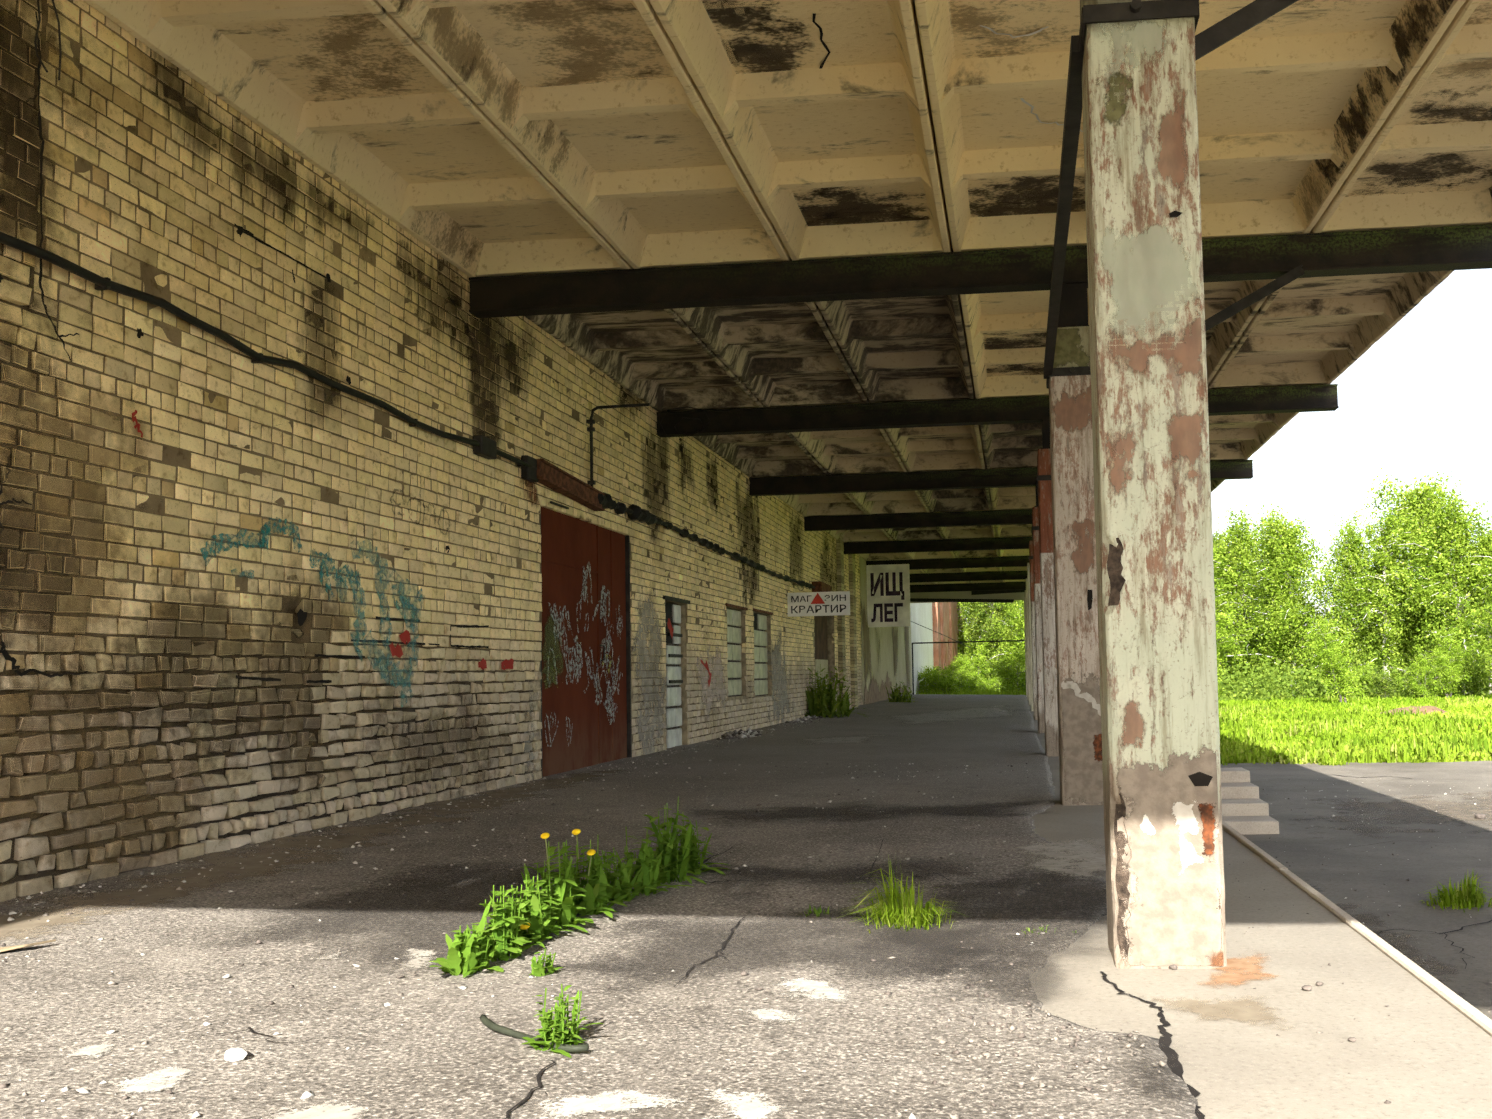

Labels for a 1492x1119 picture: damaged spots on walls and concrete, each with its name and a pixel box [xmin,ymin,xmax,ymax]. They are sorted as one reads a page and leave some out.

leakage [702,0,811,74]
crack [812,13,830,69]
leakage [153,52,369,228]
peeling [1151,89,1188,190]
leakage [794,187,929,226]
leakage [968,175,1086,217]
peeling [1167,398,1205,486]
peeling [1071,519,1126,610]
crack [0,635,88,678]
peeling [1062,672,1223,966]
crack [674,917,744,987]
crack [1101,971,1205,1119]